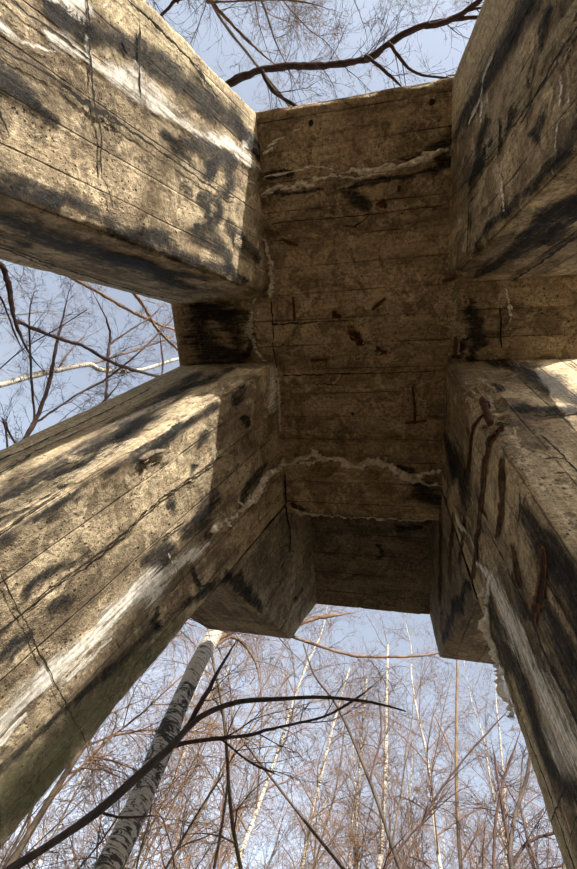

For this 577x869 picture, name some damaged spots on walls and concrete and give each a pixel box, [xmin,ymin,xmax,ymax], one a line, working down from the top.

crack [0,0,235,207]
water stain [0,0,552,298]
water stain [473,118,577,254]
water stain [474,194,577,278]
water stain [0,298,282,547]
water stain [0,432,474,774]
rust [437,396,505,607]
water stain [440,503,577,806]
water stain [452,296,577,415]
rust [530,544,577,638]